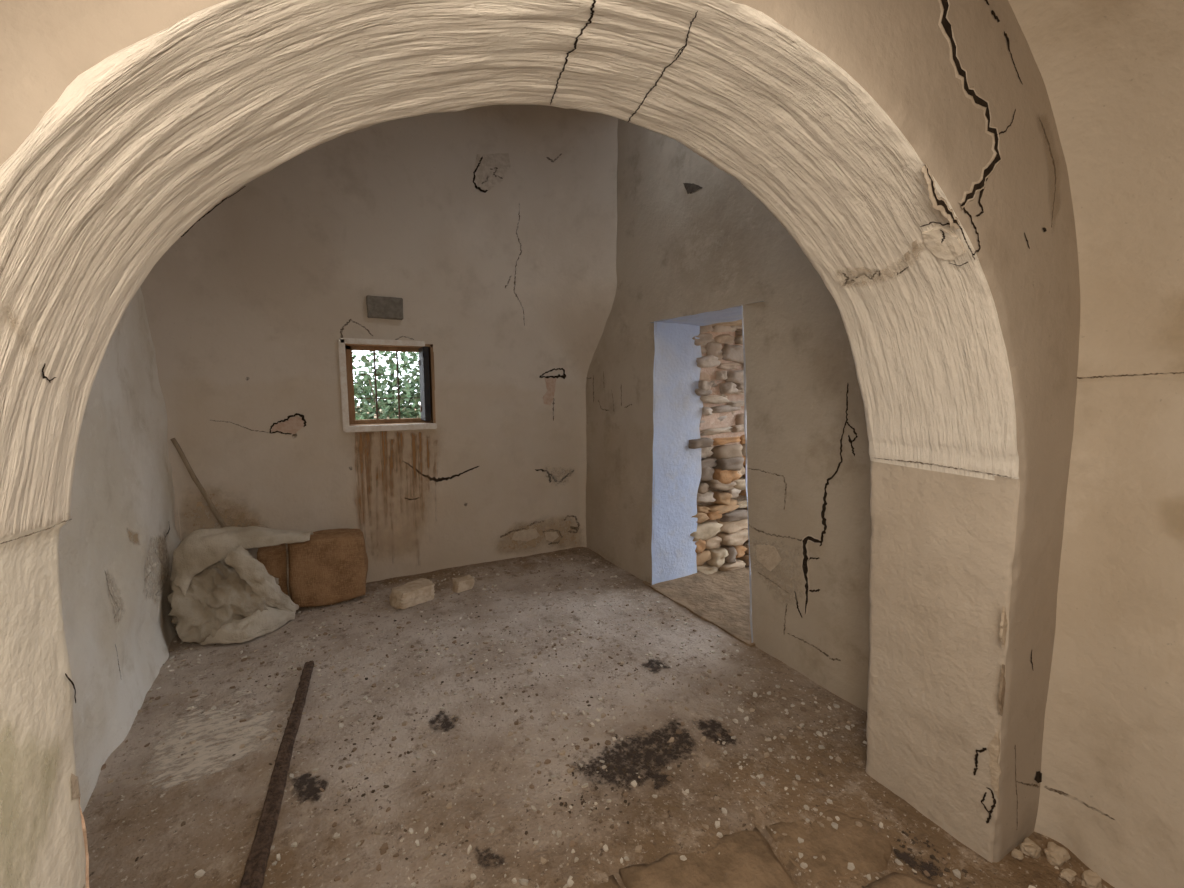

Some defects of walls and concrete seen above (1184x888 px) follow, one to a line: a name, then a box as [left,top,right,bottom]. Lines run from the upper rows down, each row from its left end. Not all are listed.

crack [550,0,596,105]
crack [628,11,698,122]
flaking render [473,153,510,193]
crack [920,0,1056,260]
crack [505,204,525,326]
flaking render [897,227,968,275]
flaking render [210,413,307,437]
crack [403,461,479,500]
crack [749,384,1007,617]